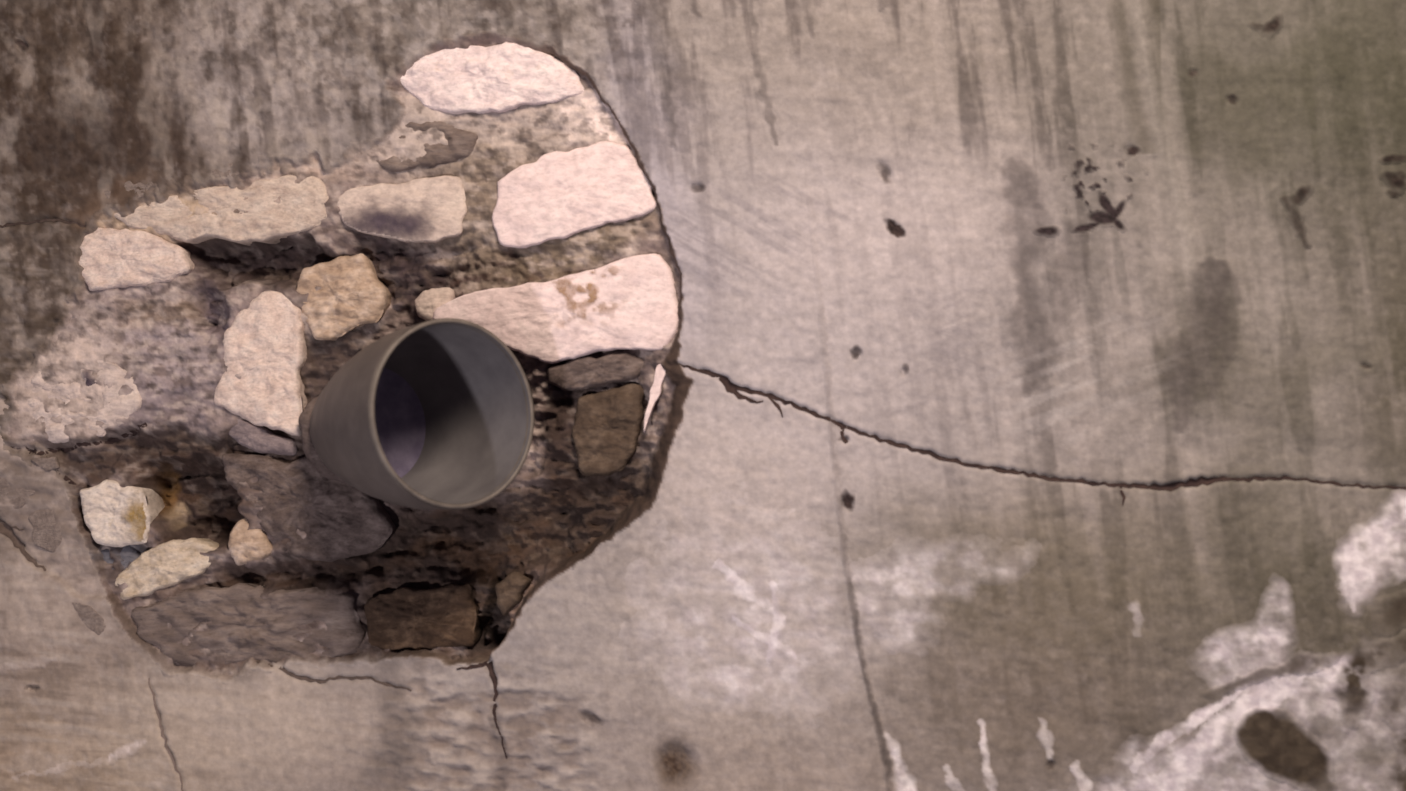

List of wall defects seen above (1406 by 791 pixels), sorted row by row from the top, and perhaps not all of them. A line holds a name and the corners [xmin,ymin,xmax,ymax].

crack [0,218,86,228]
spalling [0,28,696,684]
crack [670,363,1406,505]
leakage [1029,484,1406,791]
crack [456,661,507,759]
leakage [884,731,918,791]
leakage [941,763,967,791]
leakage [976,718,999,791]